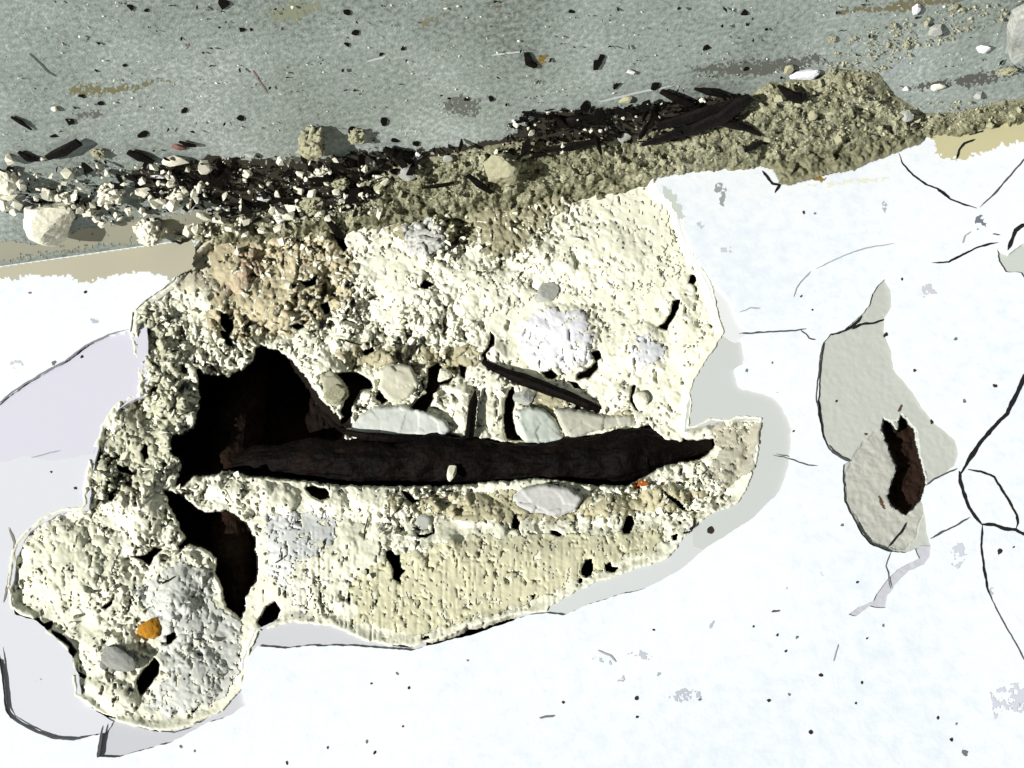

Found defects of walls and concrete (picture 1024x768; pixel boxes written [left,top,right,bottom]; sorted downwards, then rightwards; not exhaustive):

crack [762,171,781,192]
crack [899,154,1024,263]
crack [794,243,894,295]
crack [0,329,128,402]
crack [3,527,48,603]
spalling [0,179,792,758]
peeling [817,280,958,616]
rust [878,405,926,514]
crack [926,374,1024,659]
crack [0,657,191,758]